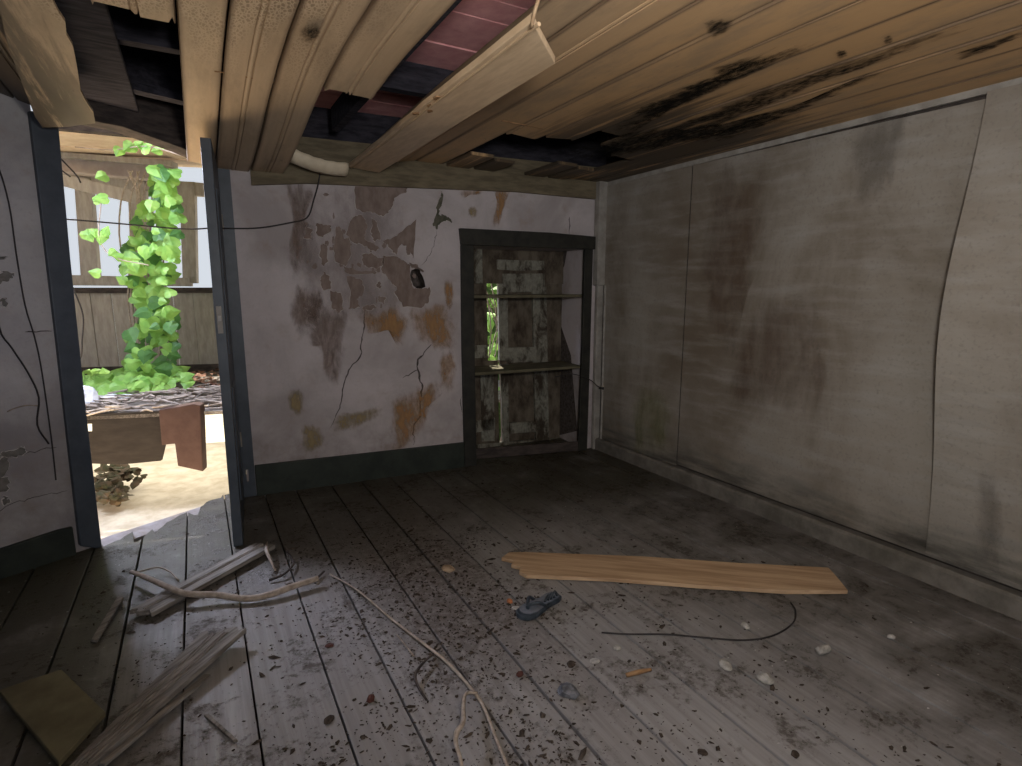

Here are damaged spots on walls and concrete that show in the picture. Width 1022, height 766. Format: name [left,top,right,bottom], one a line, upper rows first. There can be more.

damp [709,21,729,36]
damp [961,35,1014,59]
damp [575,36,918,157]
flaking render [299,186,431,313]
flaking render [432,191,453,230]
crack [330,312,365,428]
crack [403,345,431,442]
spalling [0,447,27,506]